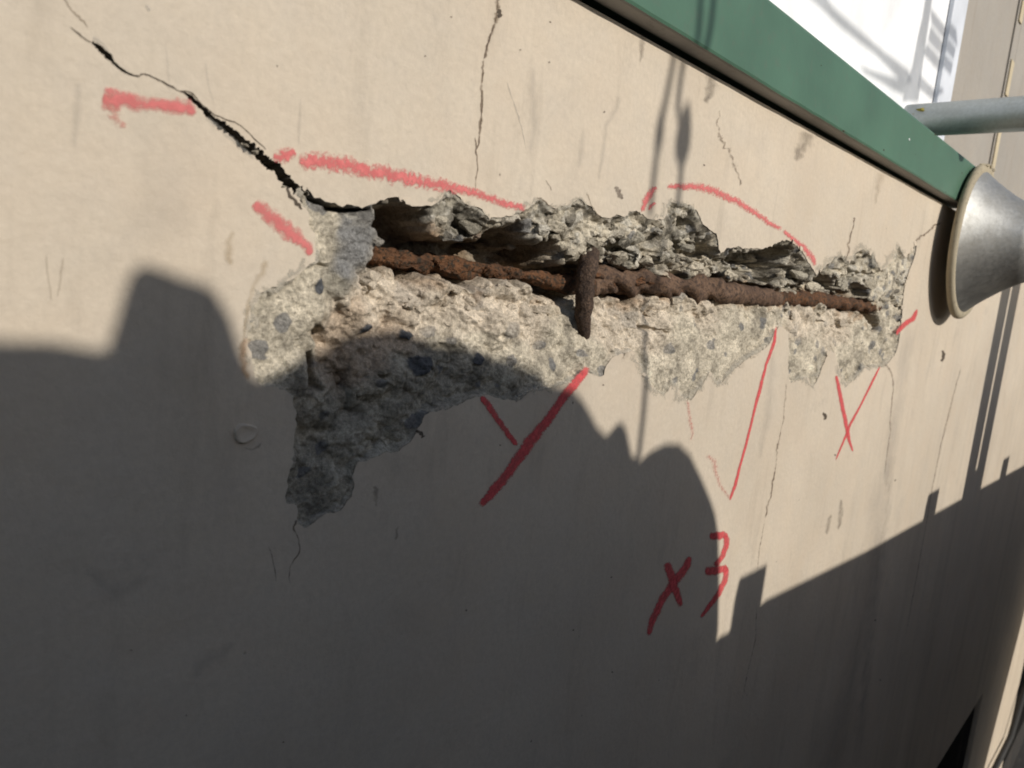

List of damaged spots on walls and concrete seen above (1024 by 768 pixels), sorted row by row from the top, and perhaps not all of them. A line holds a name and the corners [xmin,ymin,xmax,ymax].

crack [71,15,309,209]
crack [475,0,500,177]
spalling [242,186,917,528]